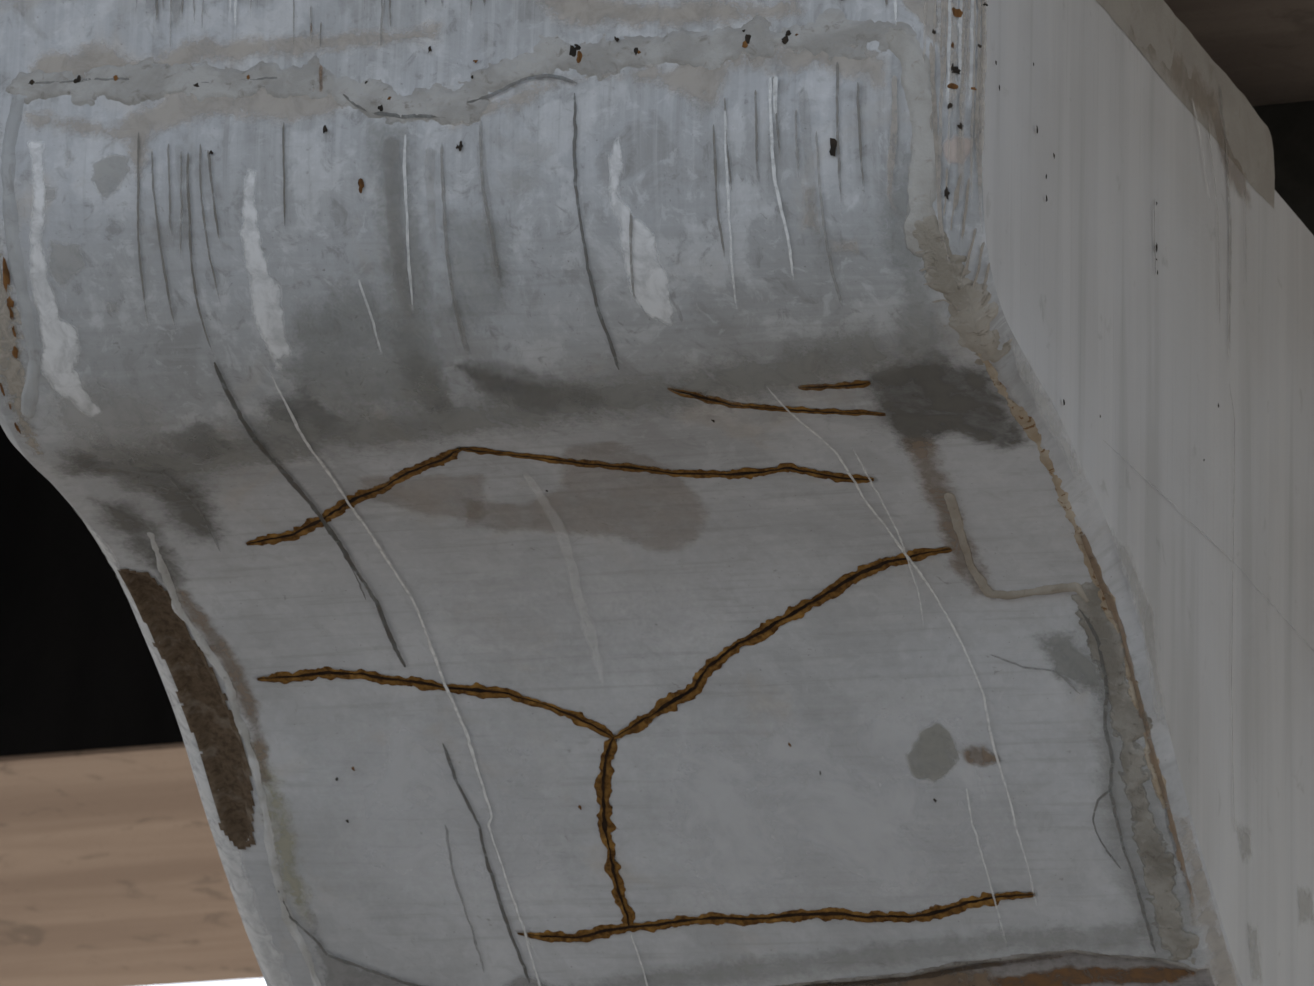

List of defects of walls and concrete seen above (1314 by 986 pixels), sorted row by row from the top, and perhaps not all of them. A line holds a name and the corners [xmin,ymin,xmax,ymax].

damp [26,87,338,347]
crack [343,94,436,119]
crack [467,74,619,370]
corrosion [0,253,43,454]
spalling [75,511,289,986]
damp [63,332,1031,986]
crack [214,362,1035,986]
spalling [908,723,959,781]
corrosion [807,955,1195,986]